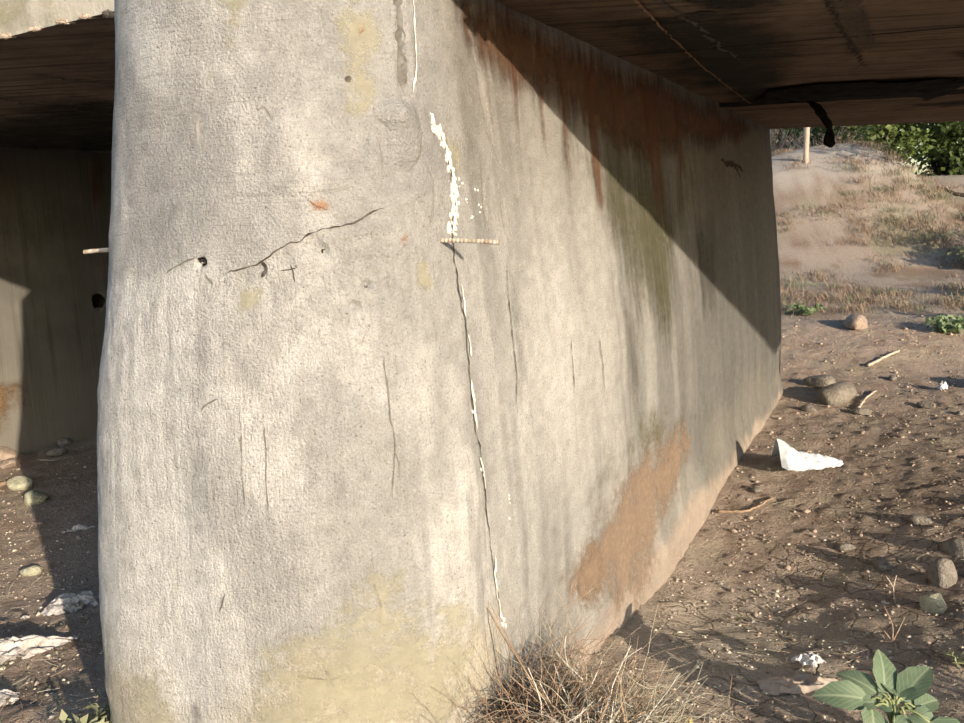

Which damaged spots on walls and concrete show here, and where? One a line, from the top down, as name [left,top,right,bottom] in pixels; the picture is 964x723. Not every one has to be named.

crack [165,208,382,284]
crack [430,113,511,629]